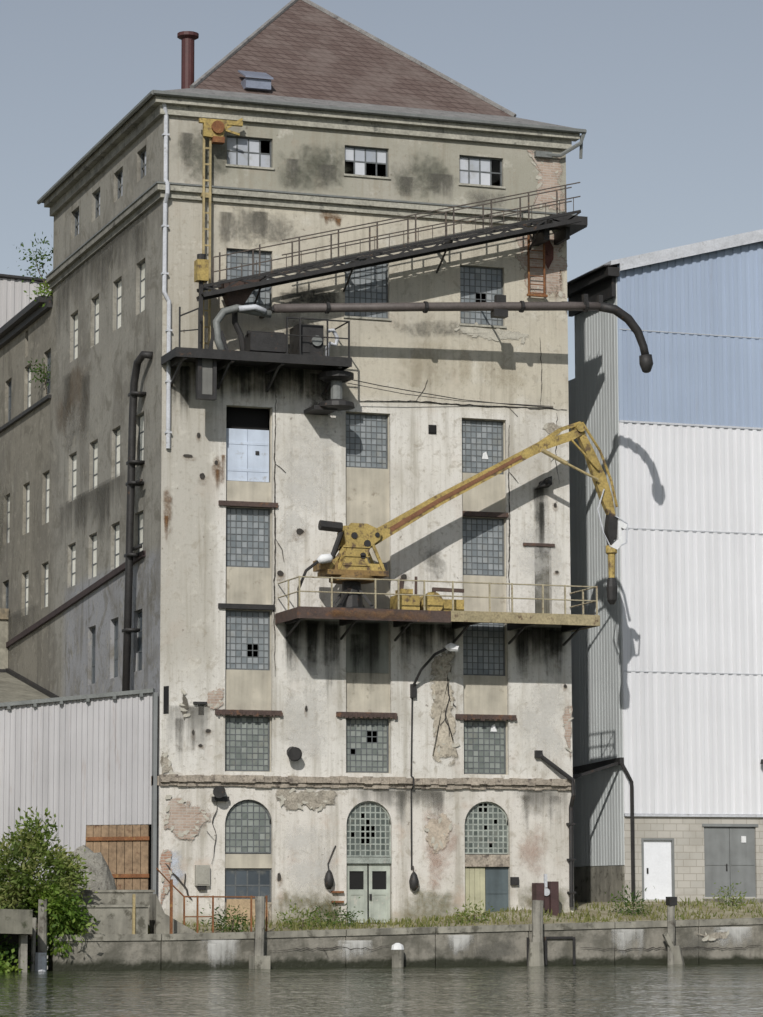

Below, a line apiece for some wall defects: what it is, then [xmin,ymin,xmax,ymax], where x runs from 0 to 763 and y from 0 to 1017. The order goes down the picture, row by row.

flaking render [527,149,565,212]
flaking render [515,233,567,298]
water stain [286,624,295,656]
water stain [308,624,339,654]
water stain [517,630,530,659]
spalling [163,686,190,720]
crack [440,675,456,737]
flaking render [163,795,211,840]
flaking render [276,788,337,811]
flaking render [424,813,452,854]
flaking render [159,849,182,905]